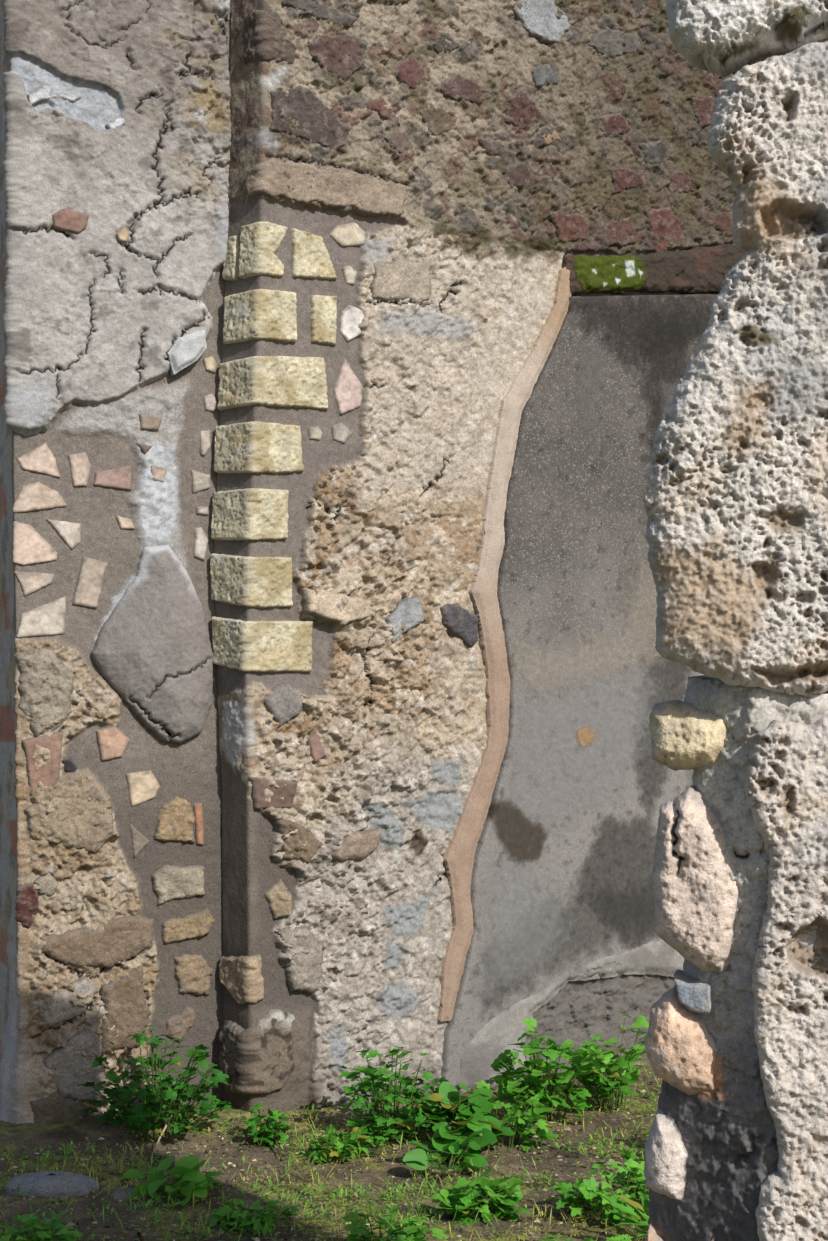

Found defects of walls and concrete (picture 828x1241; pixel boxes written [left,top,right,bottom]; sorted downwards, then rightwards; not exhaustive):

crack [211,15,228,39]
crack [15,0,219,400]
damp [571,296,712,449]
crack [129,658,211,742]
damp [490,800,546,861]
crack [671,804,685,874]
damp [581,821,657,946]